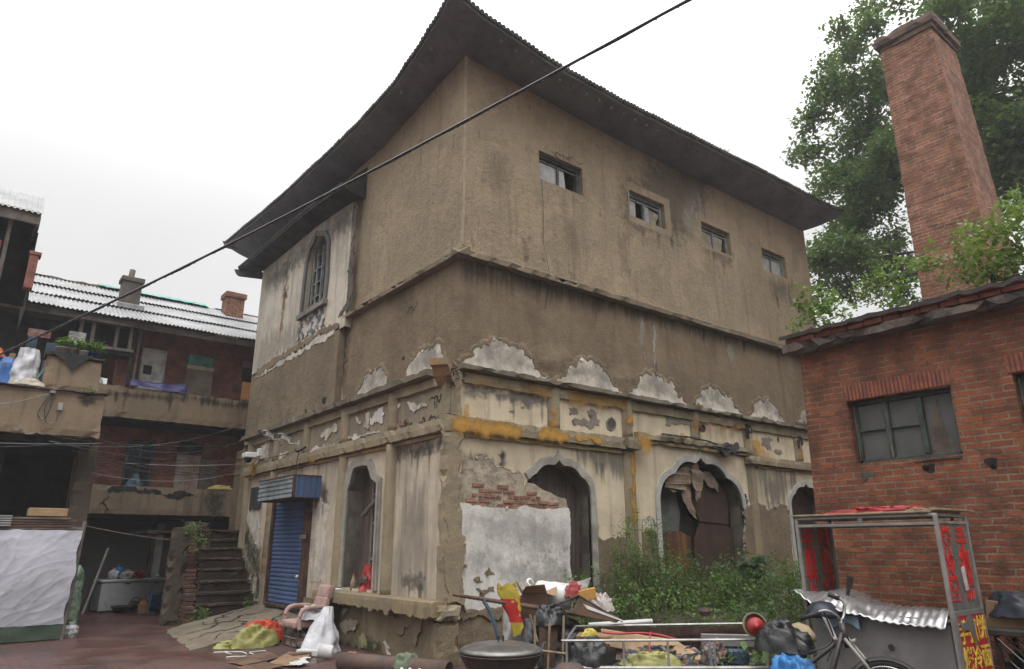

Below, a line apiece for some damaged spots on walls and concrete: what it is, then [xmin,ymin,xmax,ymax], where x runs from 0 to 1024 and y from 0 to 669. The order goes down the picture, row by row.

spalling [256,201,358,377]
peeling [341,362,389,400]
peeling [402,335,807,455]
flaking render [465,481,568,511]
water stain [403,573,424,590]
crack [187,608,284,640]